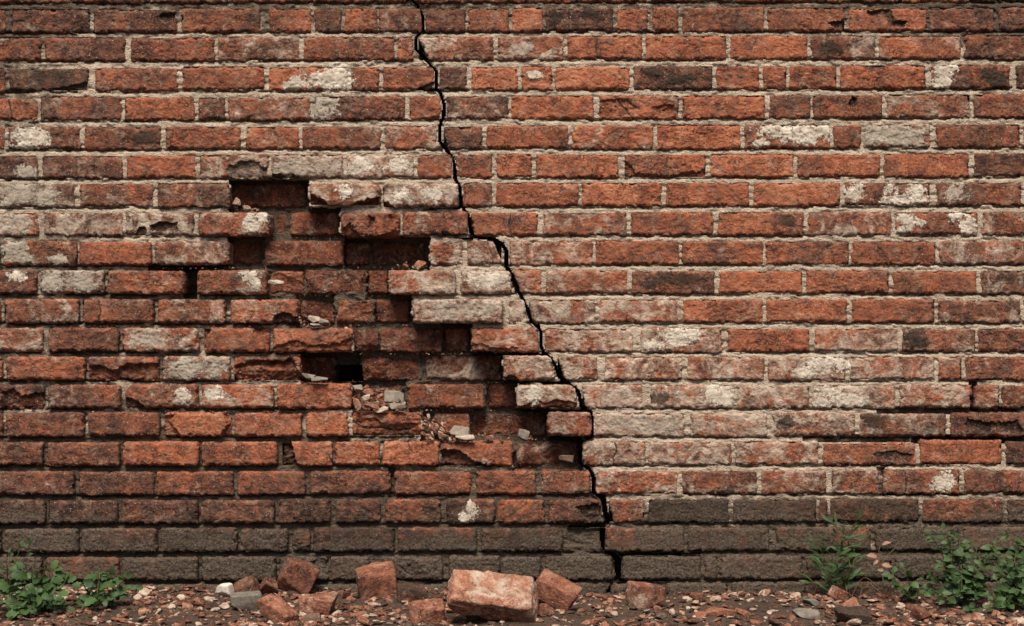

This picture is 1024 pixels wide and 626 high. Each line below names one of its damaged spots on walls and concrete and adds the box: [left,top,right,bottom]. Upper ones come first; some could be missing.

spalling [220,412,233,437]
spalling [224,158,581,471]
crack [411,0,700,591]